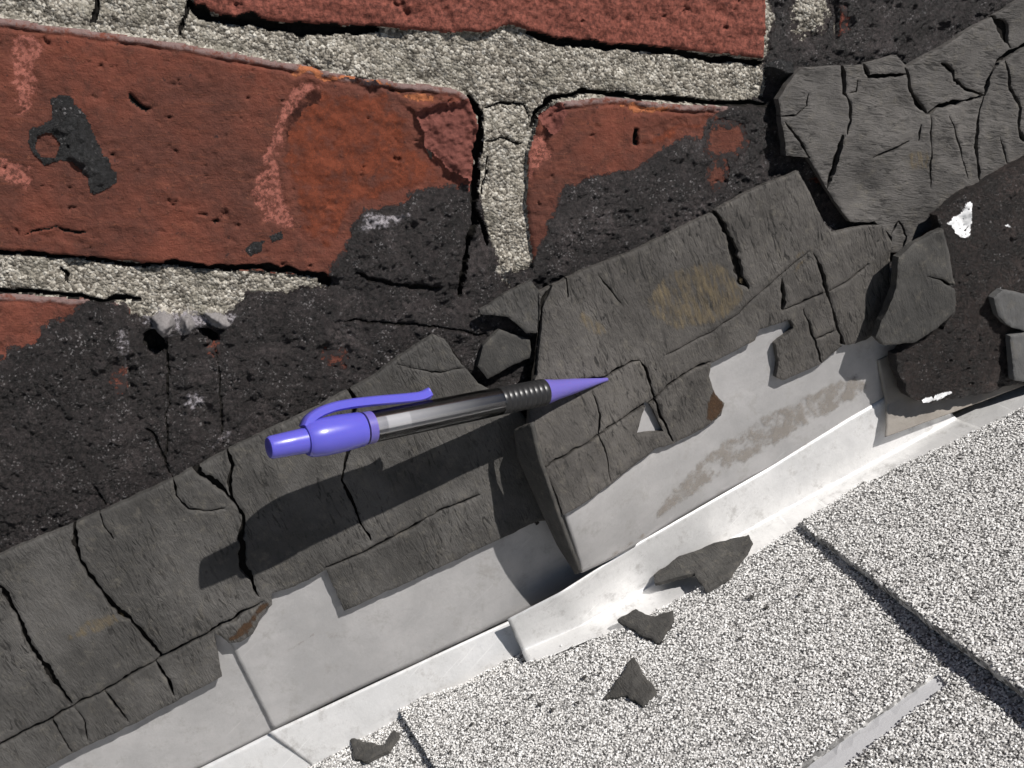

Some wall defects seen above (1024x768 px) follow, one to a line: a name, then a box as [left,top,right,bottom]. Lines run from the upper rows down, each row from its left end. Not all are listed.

crack [0,88,793,304]
spalling [143,329,165,351]
spalling [198,327,219,342]
peeling [476,279,539,379]
crack [347,388,356,413]
crack [590,363,675,451]
corrosion [707,391,724,421]
crack [147,339,257,630]
crack [341,451,387,539]
crack [0,585,87,733]
crack [72,486,187,711]
corrosion [229,603,268,640]